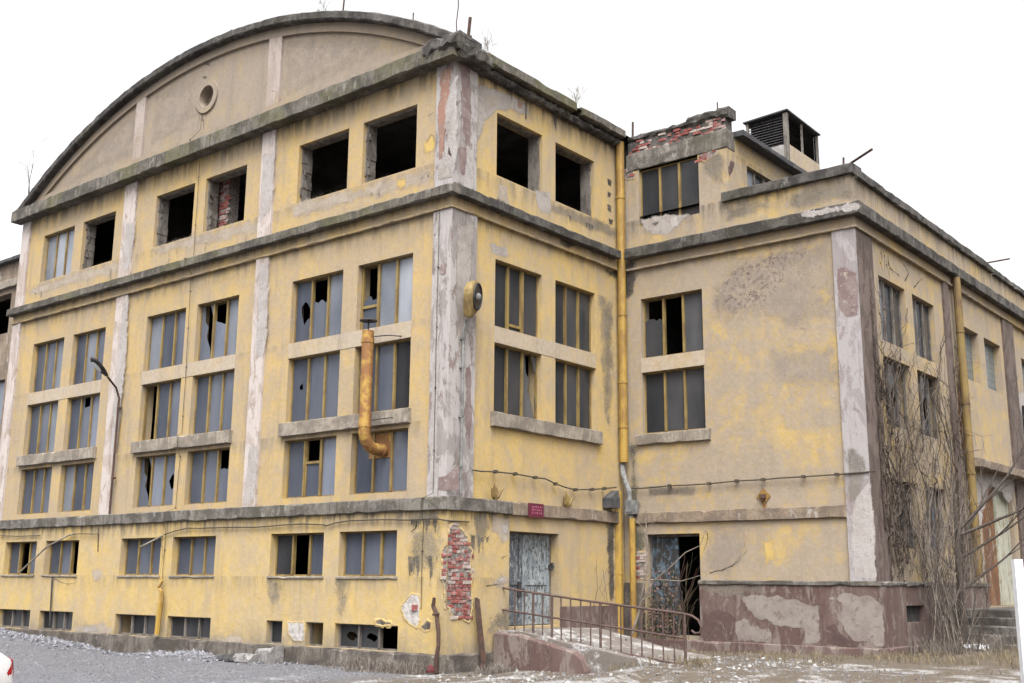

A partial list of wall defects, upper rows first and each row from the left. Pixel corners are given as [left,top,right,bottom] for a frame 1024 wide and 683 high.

peeling [290,65,530,217]
peeling [640,213,689,235]
peeling [801,202,860,218]
peeling [837,267,859,317]
peeling [428,223,474,491]
damp [408,510,444,586]
flaking render [439,522,474,624]
damp [471,513,490,554]
peeling [850,484,877,580]
flaking render [287,620,305,643]
flaking render [374,592,433,634]
peeling [701,584,885,648]